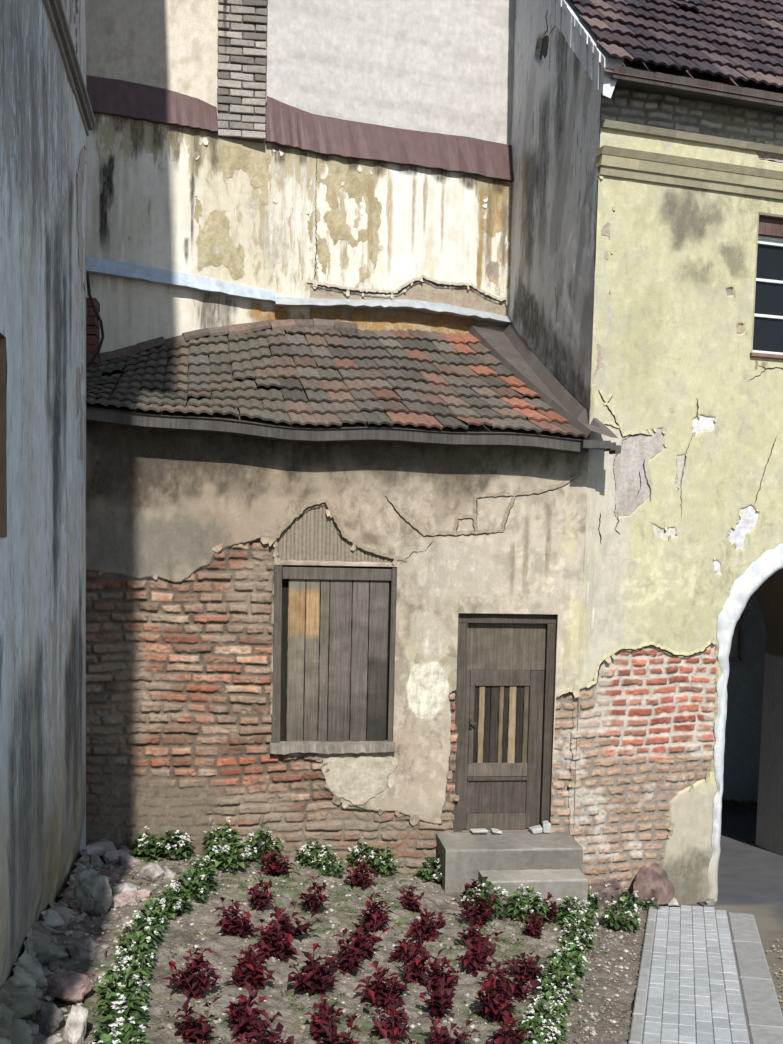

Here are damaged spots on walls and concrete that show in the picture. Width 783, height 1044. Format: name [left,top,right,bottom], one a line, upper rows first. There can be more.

crack [307,155,510,303]
peeling [306,163,512,328]
leakage [487,179,506,260]
leakage [525,33,578,255]
crack [242,472,582,564]
crack [598,389,653,501]
spalling [613,426,668,519]
crack [681,399,699,515]
leakage [9,657,44,949]
leakage [66,587,83,789]
flaking render [86,534,459,877]
flaking render [529,636,717,893]